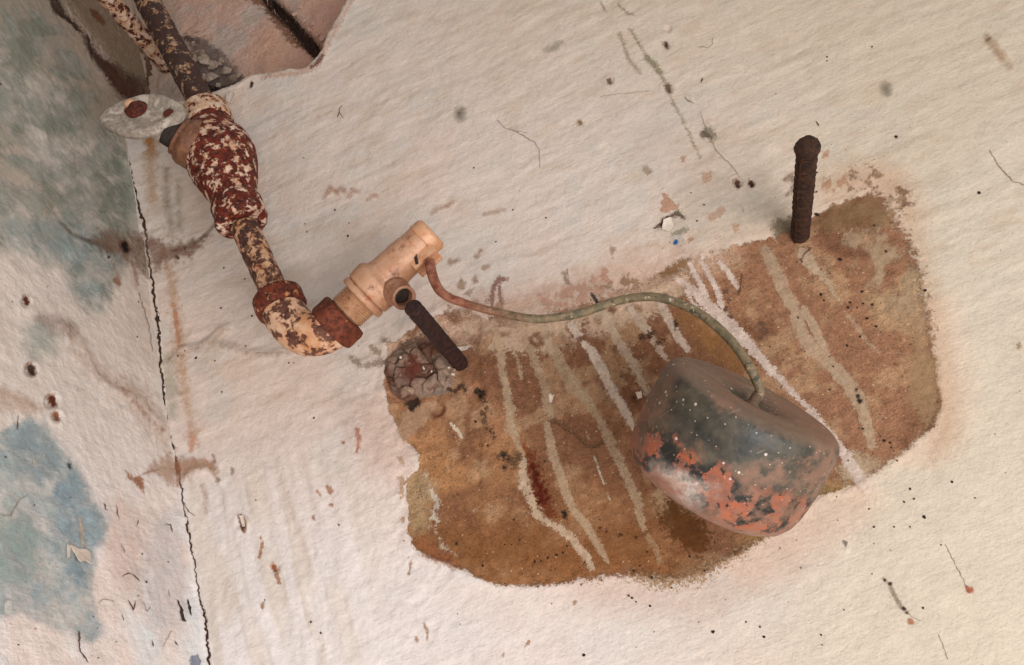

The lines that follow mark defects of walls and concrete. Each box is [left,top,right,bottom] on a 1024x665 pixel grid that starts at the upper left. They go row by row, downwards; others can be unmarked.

spalling [139,49,184,102]
spalling [162,0,351,95]
damp [538,272,640,312]
crack [99,156,212,665]
damp [443,296,638,571]
damp [567,302,690,431]
spalling [349,135,942,588]
damp [659,248,876,494]
damp [624,536,775,594]